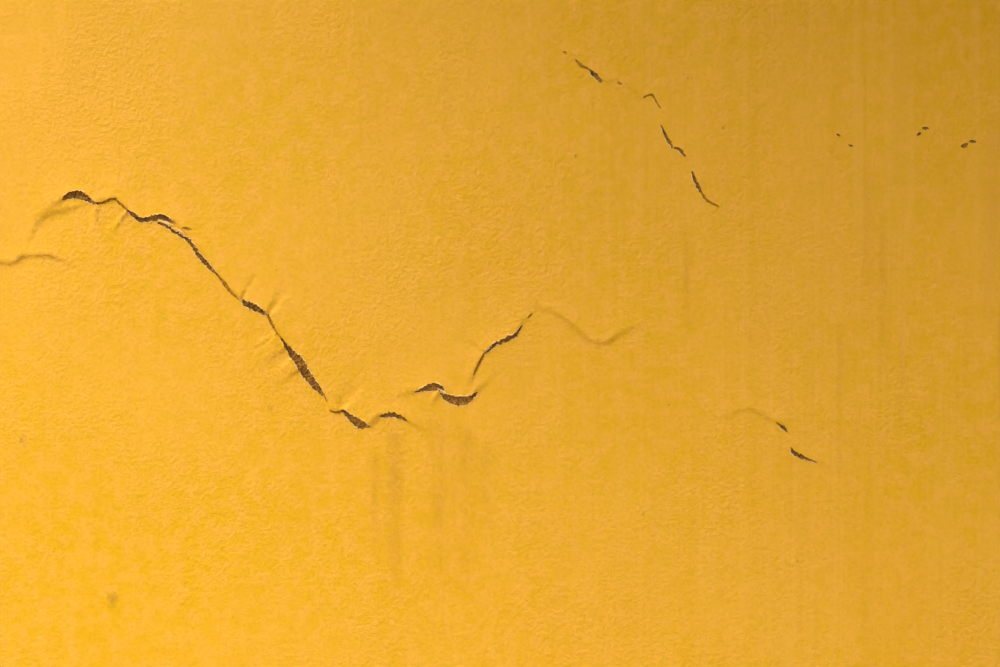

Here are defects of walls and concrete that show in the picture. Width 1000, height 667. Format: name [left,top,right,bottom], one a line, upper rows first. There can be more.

crack [563,51,622,85]
crack [643,94,719,207]
crack [0,254,62,268]
crack [36,189,407,430]
crack [415,313,629,407]
crack [747,409,817,463]